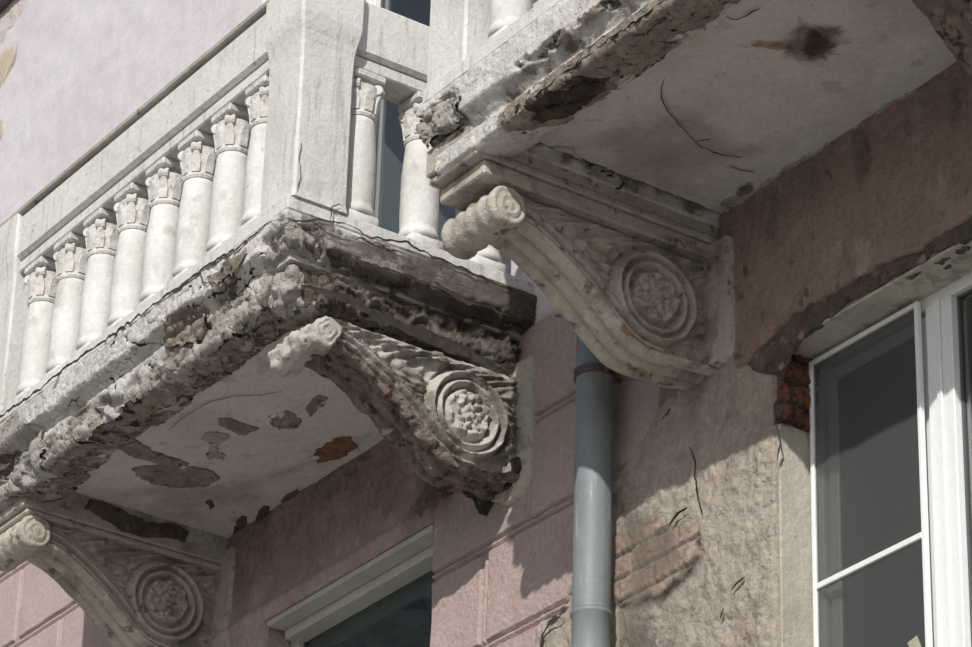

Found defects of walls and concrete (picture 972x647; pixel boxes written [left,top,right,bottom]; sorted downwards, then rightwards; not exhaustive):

spalling [489,0,741,133]
peeling [415,91,467,149]
crack [660,81,753,172]
spalling [721,142,830,213]
spalling [0,217,349,513]
spalling [233,505,269,535]
spalling [309,436,358,463]
crack [669,447,703,526]
flaking render [610,216,972,647]
flaking render [535,602,572,647]